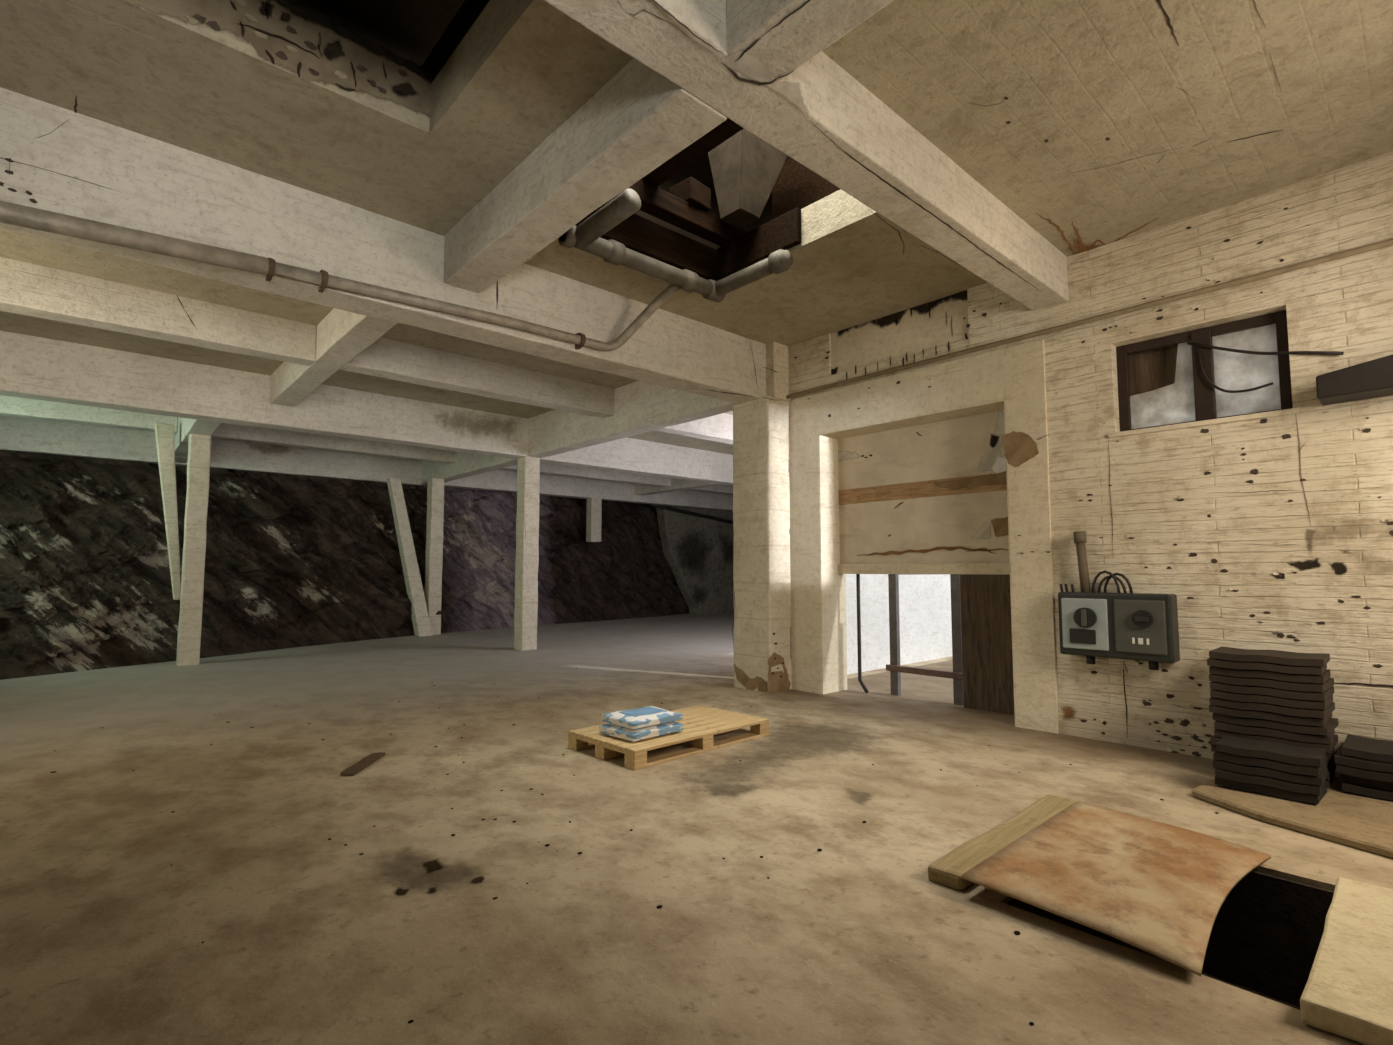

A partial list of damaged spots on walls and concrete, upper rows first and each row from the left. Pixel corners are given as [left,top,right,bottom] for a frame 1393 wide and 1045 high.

peeling [124,0,438,117]
crack [621,0,811,54]
crack [1156,0,1179,46]
spalling [824,290,1002,359]
spalling [978,411,1050,474]